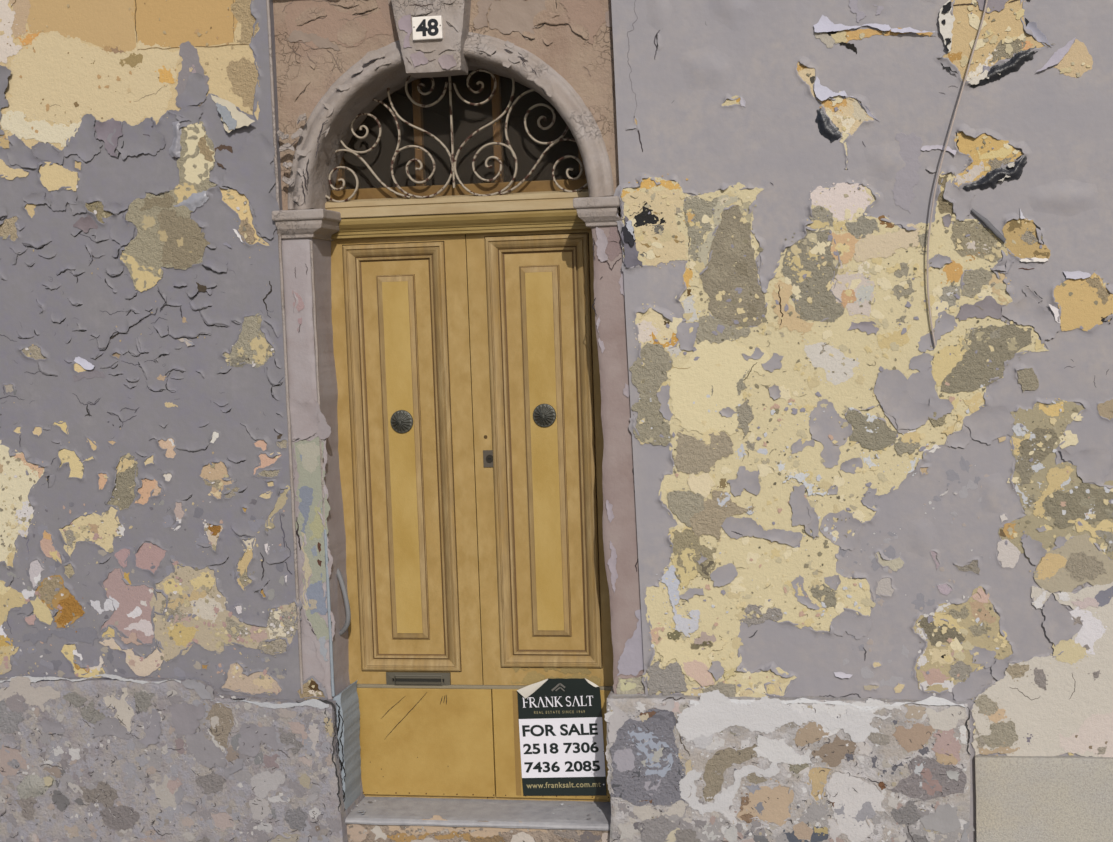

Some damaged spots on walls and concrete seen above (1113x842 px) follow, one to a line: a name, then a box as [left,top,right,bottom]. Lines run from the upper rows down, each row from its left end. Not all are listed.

peeling [388,0,457,70]
crack [280,0,582,206]
peeling [473,0,547,68]
peeling [527,72,554,97]
crack [584,0,660,152]
peeling [797,62,874,170]
peeling [837,28,933,43]
peeling [941,0,1049,82]
flaking render [0,0,311,382]
peeling [595,227,608,262]
peeling [606,131,1113,842]
peeling [0,398,331,794]